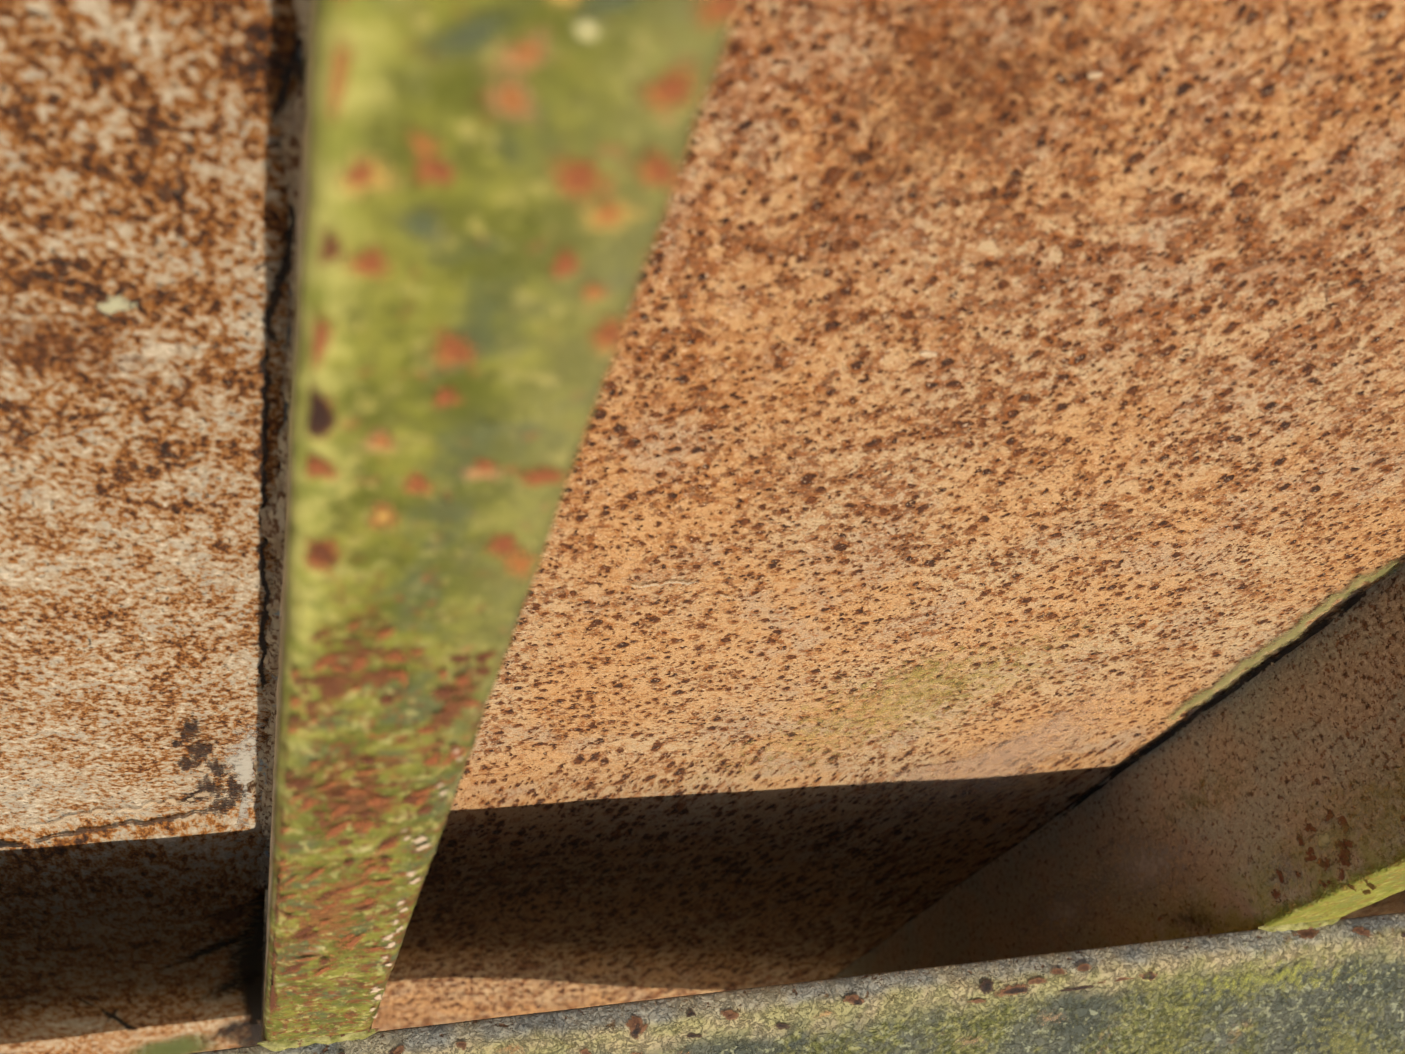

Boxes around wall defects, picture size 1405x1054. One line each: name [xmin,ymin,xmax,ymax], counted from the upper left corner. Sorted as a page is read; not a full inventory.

rust [576,21,597,39]
crack [266,38,306,150]
rust [492,41,544,116]
rust [557,161,646,229]
rust [319,232,385,276]
crack [254,185,296,691]
rust [307,390,335,438]
rust [306,456,336,480]
rust [305,541,339,570]
crack [0,792,216,848]
rust [270,619,496,1015]
rust [1271,810,1377,903]